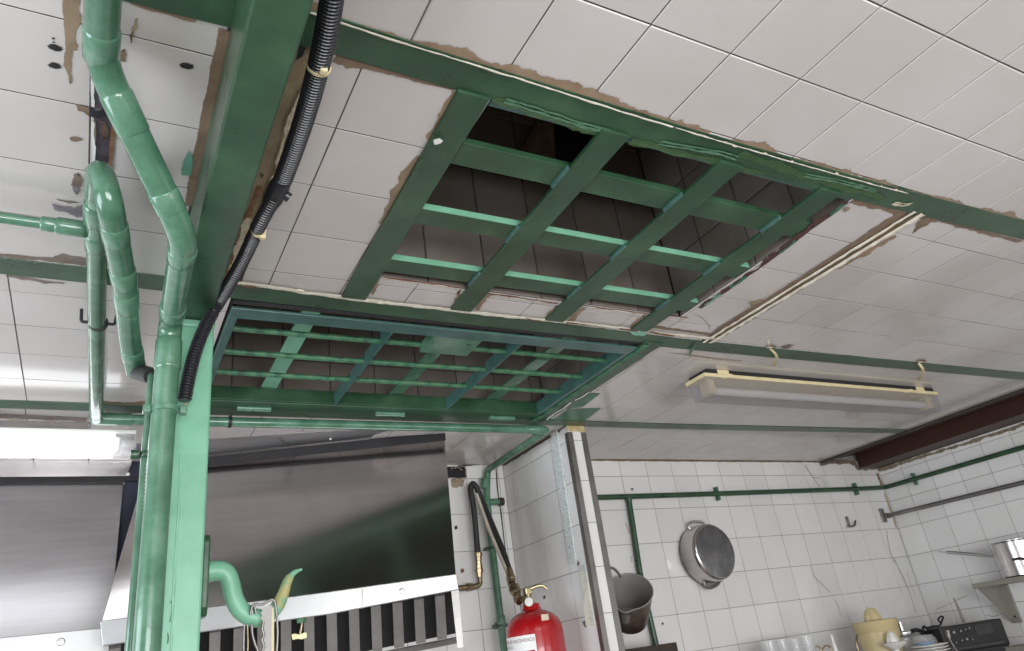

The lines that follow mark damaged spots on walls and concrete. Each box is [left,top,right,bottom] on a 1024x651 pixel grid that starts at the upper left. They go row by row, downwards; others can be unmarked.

peeling [237,22,925,370]
spalling [819,423,1024,471]